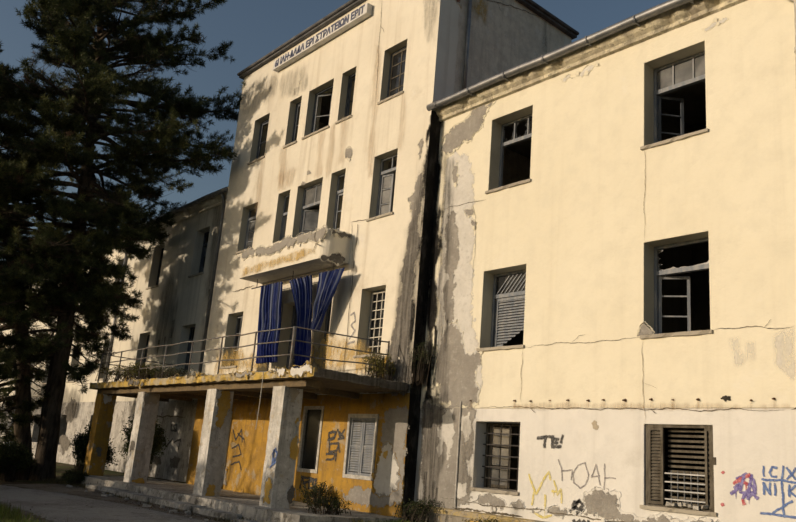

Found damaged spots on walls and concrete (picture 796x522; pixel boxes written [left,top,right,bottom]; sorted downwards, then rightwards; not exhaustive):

spalling [241,225,352,261]
spalling [319,252,346,266]
peeling [268,338,374,405]
water stain [317,111,450,518]
spalling [342,173,425,508]
peeling [420,100,721,522]
crack [714,319,790,330]
peeling [214,390,232,431]